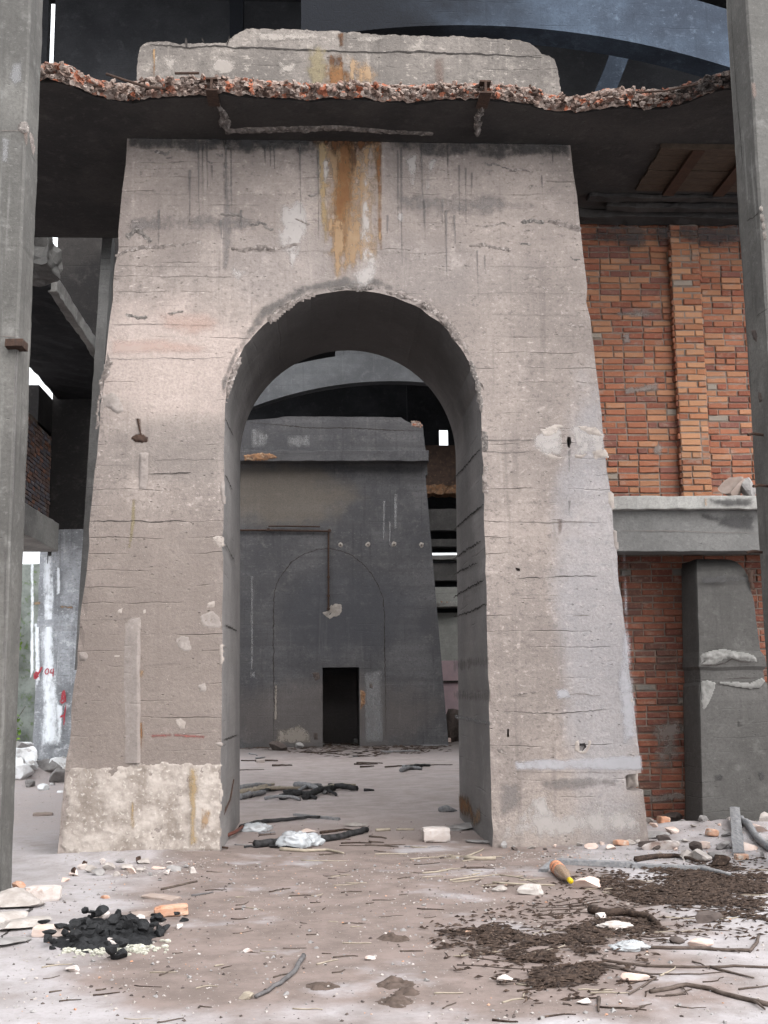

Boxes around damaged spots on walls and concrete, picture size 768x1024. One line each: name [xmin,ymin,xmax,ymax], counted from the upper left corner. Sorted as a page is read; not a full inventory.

rust [309,33,374,84]
spalling [40,61,731,113]
rust [312,141,382,276]
spalling [267,285,484,413]
spalling [225,357,242,403]
spalling [535,424,609,460]
peeling [323,604,342,619]
peeling [701,678,765,709]